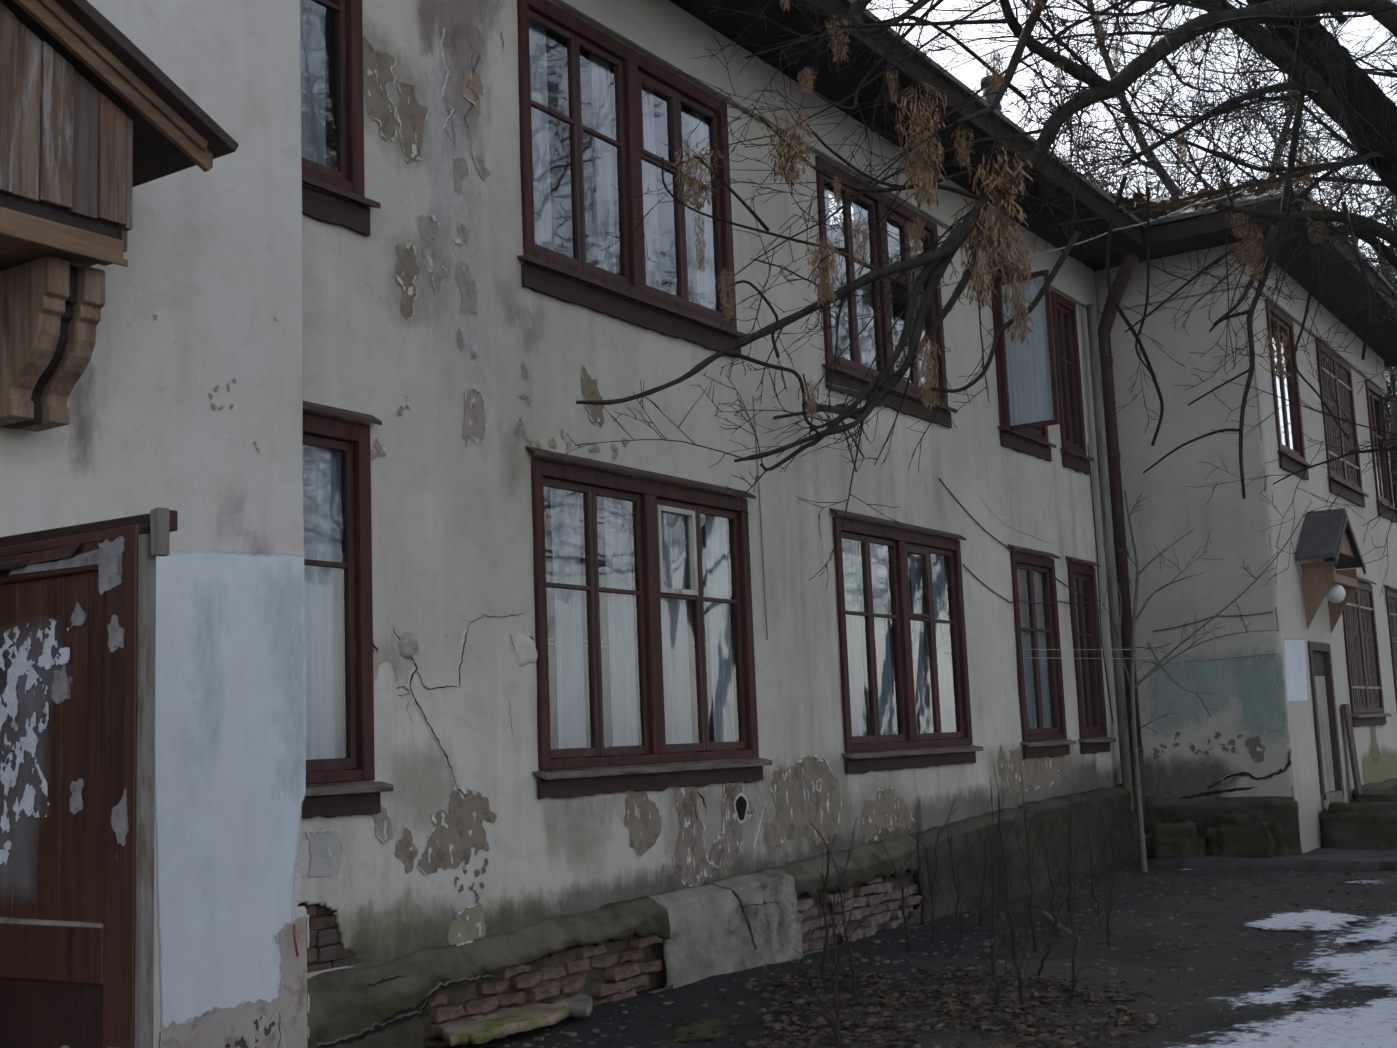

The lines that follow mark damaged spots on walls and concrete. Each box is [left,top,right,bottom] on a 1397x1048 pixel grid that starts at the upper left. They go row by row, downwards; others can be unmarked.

peeling [363,36,430,164]
peeling [395,215,478,359]
peeling [514,362,629,461]
crack [373,613,535,799]
peeling [372,783,499,946]
peeling [623,754,842,887]
water stain [484,761,1120,936]
water stain [1144,760,1238,799]
crack [1180,749,1292,799]
peeling [160,903,359,1048]
crack [317,975,493,1048]
flaking render [423,934,663,1047]